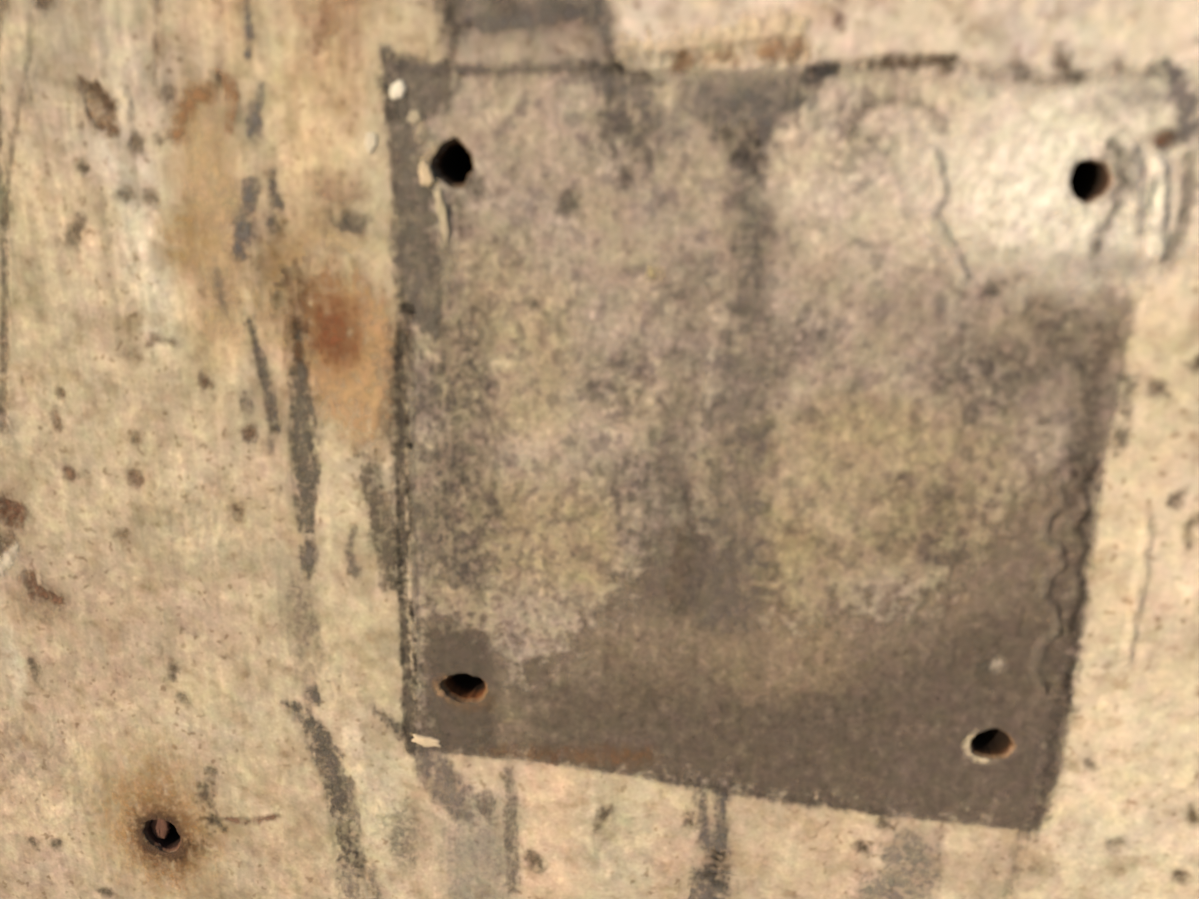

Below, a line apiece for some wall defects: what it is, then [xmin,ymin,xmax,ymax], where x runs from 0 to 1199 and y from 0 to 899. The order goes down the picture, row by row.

corrosion [270,254,399,443]